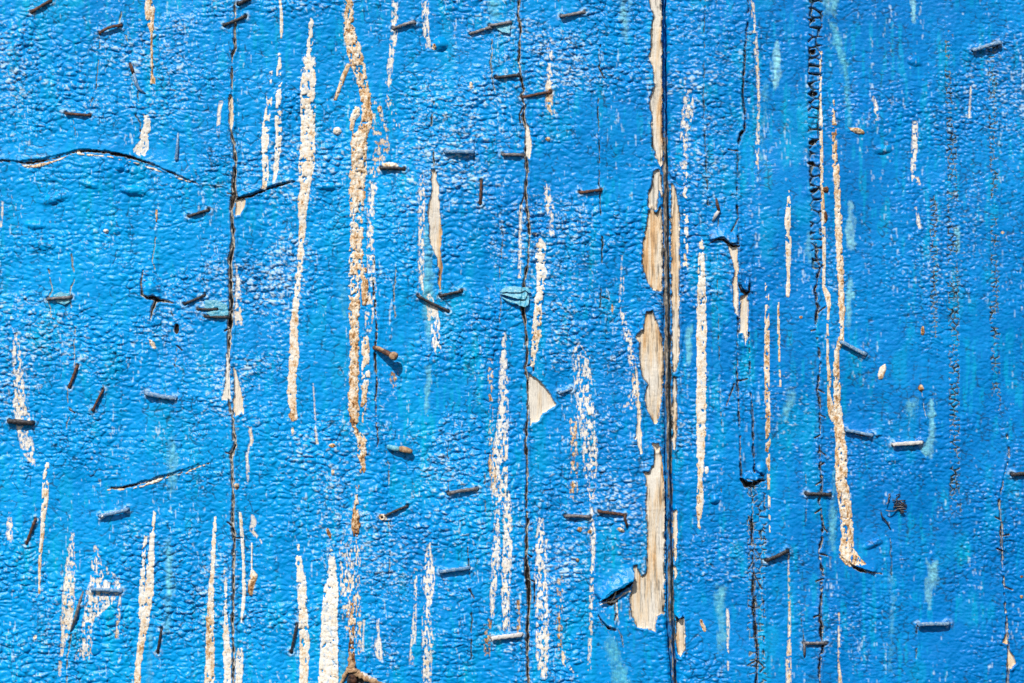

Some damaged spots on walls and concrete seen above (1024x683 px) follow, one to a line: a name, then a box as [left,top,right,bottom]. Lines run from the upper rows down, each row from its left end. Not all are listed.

peeling [58,534,121,676]
crack [0,11,199,185]
crack [108,3,295,683]
peeling [287,18,316,434]
peeling [295,0,400,683]
peeling [418,170,443,352]
peeling [484,333,521,656]
crack [490,0,535,683]
peeling [500,184,556,426]
peeling [569,0,709,670]
peeling [807,49,866,567]
crack [801,0,892,683]